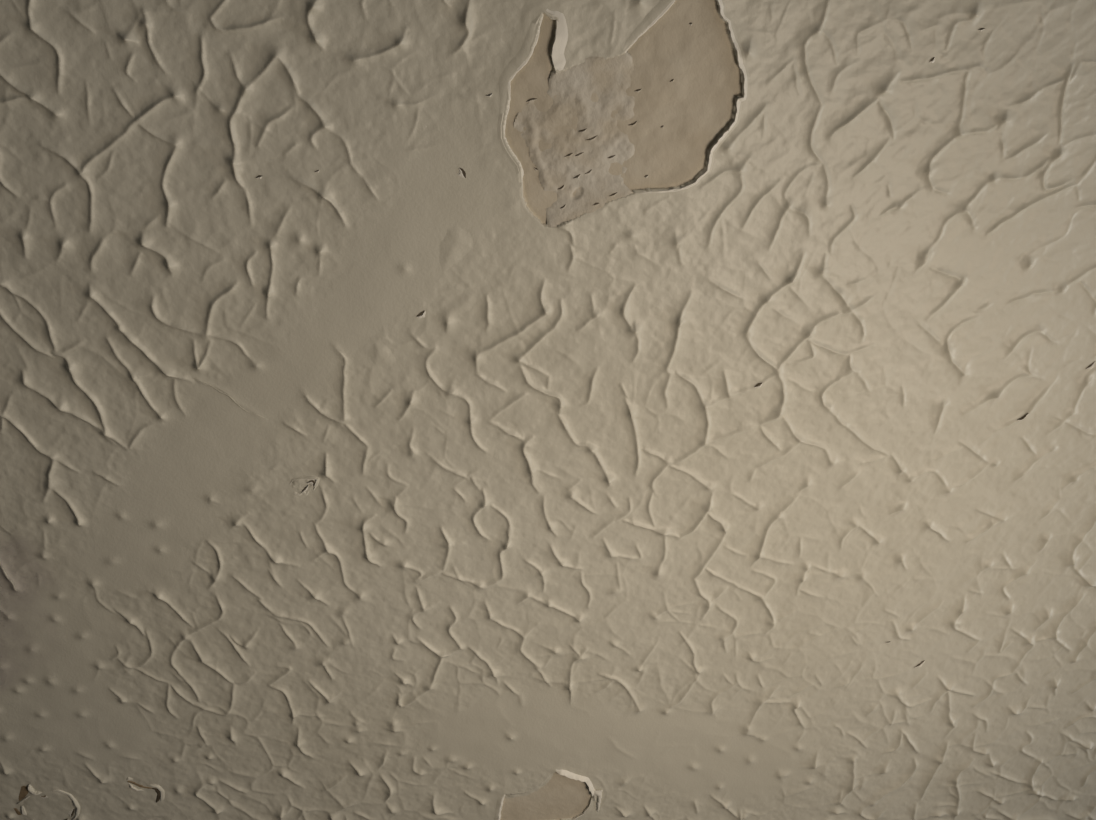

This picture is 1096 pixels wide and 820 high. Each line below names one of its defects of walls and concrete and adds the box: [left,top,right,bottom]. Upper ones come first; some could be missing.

peeling [497,0,750,229]
peeling [494,769,603,820]